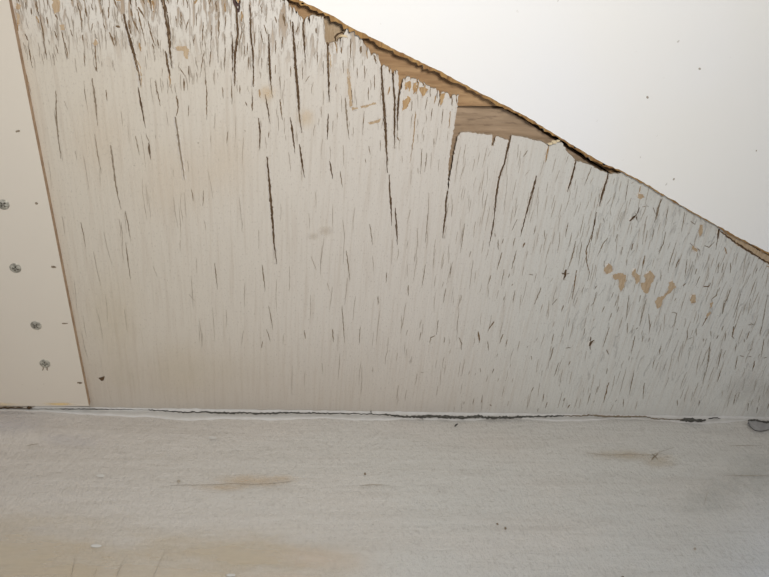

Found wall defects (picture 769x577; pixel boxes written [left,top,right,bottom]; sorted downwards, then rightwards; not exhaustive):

peeling [347,78,376,111]
peeling [401,80,428,111]
crack [17,0,769,427]
peeling [719,230,769,264]
peeling [604,263,656,294]